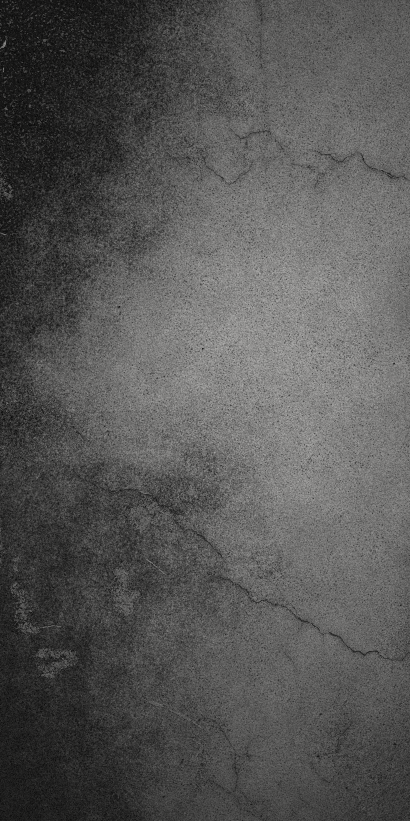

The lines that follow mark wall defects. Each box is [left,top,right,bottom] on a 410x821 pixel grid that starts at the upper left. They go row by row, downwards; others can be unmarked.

crack [170,104,410,190]
crack [73,470,409,670]